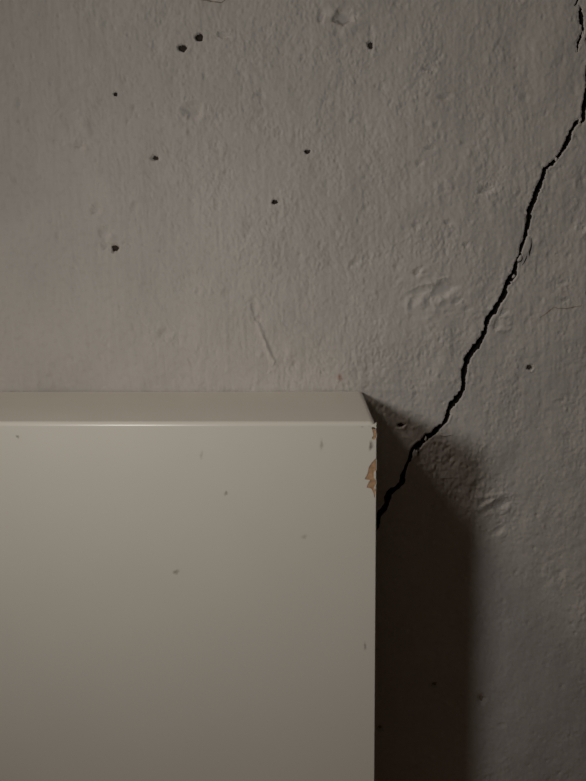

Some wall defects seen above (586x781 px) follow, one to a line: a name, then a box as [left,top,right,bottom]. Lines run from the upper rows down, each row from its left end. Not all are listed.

crack [376,0,586,538]